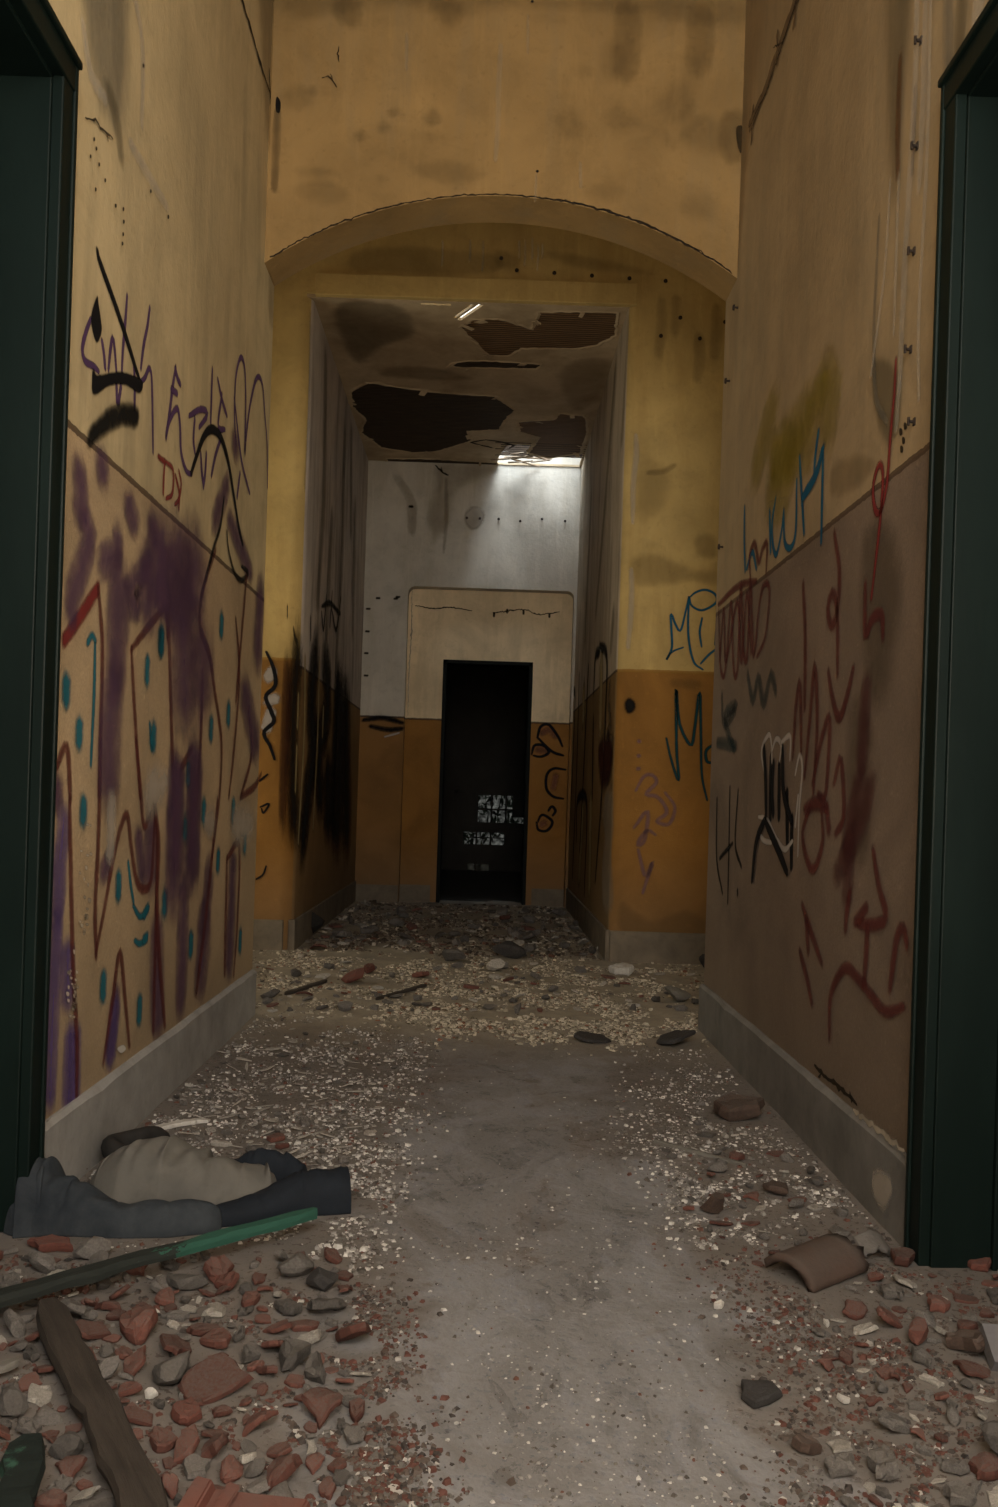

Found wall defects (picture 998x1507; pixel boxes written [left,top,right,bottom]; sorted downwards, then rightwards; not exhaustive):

flaking render [446,310,621,372]
flaking render [347,382,592,466]